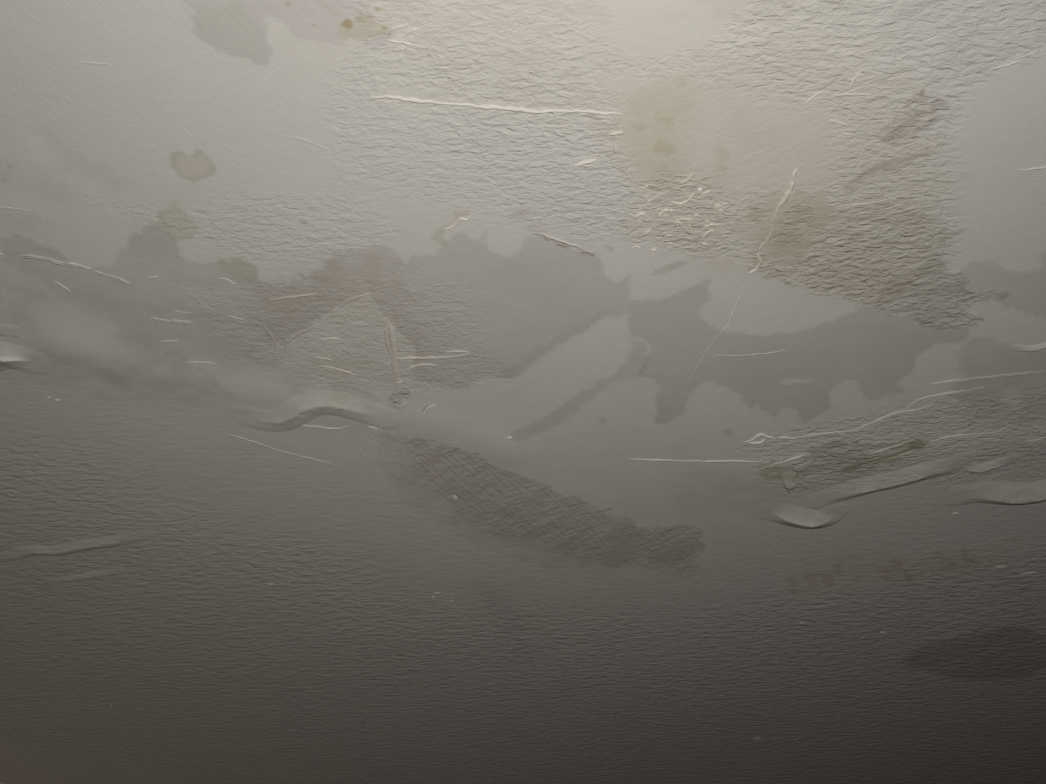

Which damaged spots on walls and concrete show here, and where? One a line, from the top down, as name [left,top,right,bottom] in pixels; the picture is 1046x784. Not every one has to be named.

crack [529,232,597,255]
damp [732,146,936,268]
damp [0,198,1046,444]
damp [895,623,1046,682]